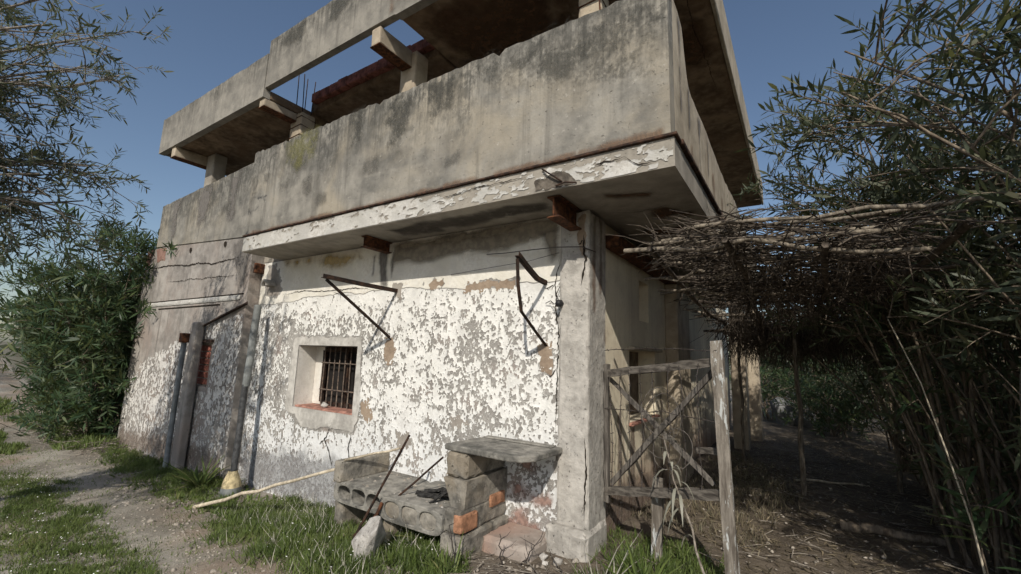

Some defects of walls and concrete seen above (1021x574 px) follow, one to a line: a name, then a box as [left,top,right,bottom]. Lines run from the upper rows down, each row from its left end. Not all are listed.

water stain [432,0,567,63]
peeling [242,144,673,251]
crack [153,257,239,282]
peeling [119,332,190,460]
peeling [187,314,243,474]
peeling [238,266,560,532]